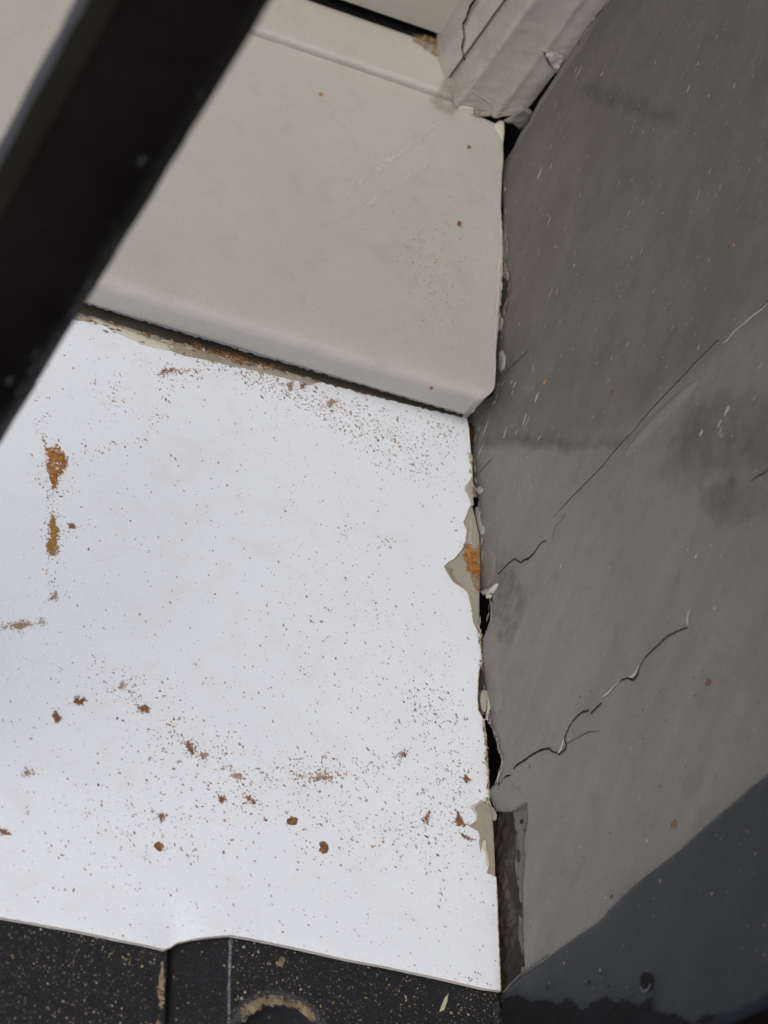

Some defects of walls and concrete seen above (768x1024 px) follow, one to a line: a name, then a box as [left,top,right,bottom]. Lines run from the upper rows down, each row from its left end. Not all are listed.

corrosion [36,429,68,493]
corrosion [41,510,77,560]
corrosion [458,541,482,591]
crack [497,300,768,575]
spalling [445,418,528,1004]
crack [495,610,690,785]